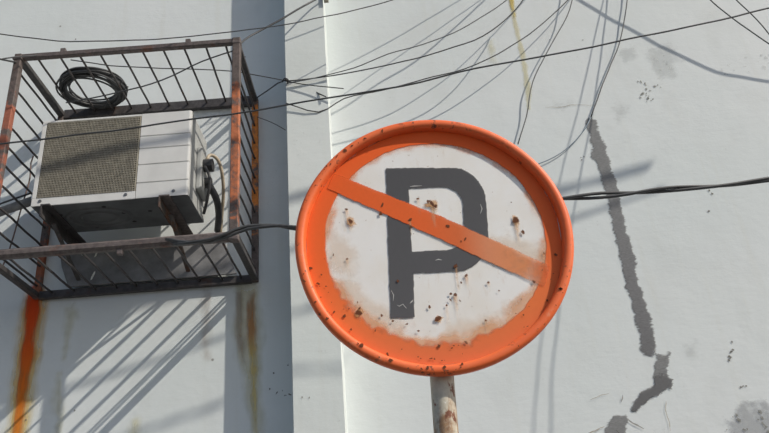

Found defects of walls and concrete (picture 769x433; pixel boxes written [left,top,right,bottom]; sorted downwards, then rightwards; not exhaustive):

rust [11,286,43,433]